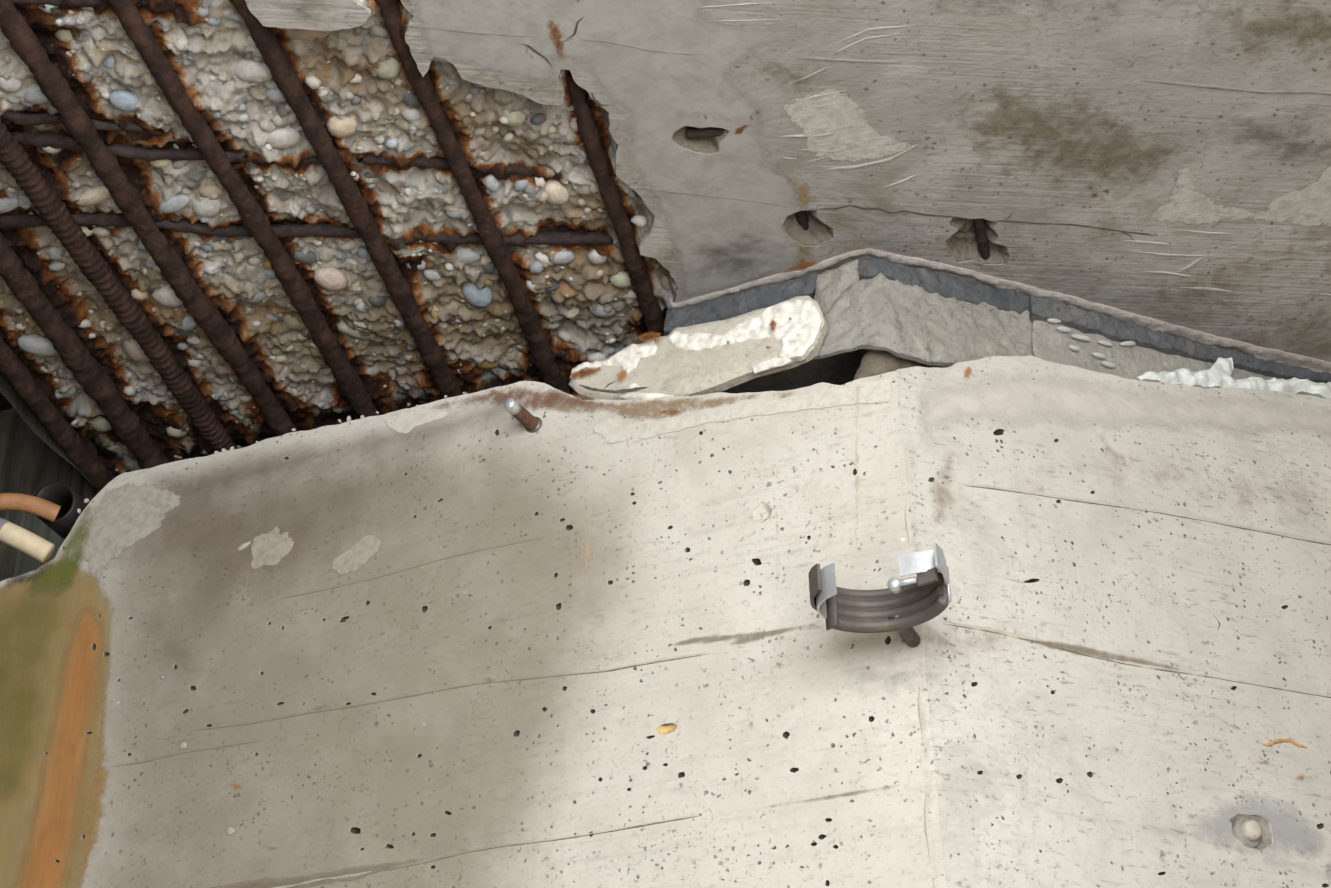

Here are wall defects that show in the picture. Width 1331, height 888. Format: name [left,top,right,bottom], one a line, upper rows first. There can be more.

corrosion [81,413,133,476]
spalling [0,28,275,491]
corrosion [0,0,355,462]
spalling [38,0,443,429]
corrosion [133,0,445,415]
spalling [281,0,540,394]
corrosion [229,0,623,409]
spalling [432,56,645,374]
corrosion [550,22,667,342]
spalling [588,93,677,310]
spalling [552,391,754,418]
spalling [946,218,1010,264]